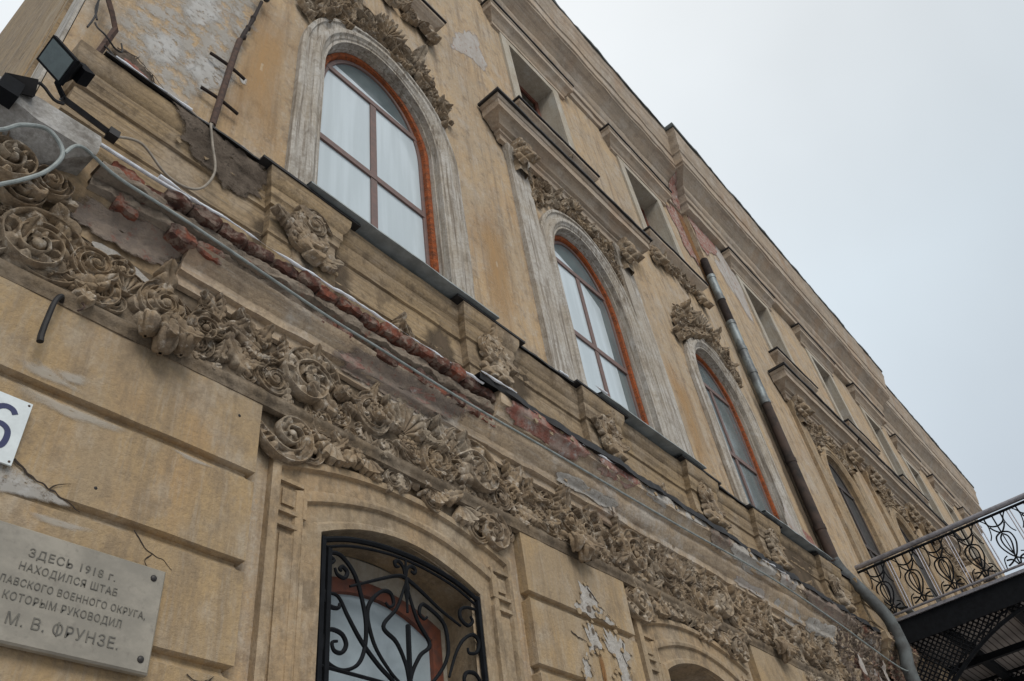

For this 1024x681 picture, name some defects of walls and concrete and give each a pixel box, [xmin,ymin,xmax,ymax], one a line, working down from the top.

peeling [113,0,267,200]
flaking render [86,160,906,681]
crack [134,530,170,568]